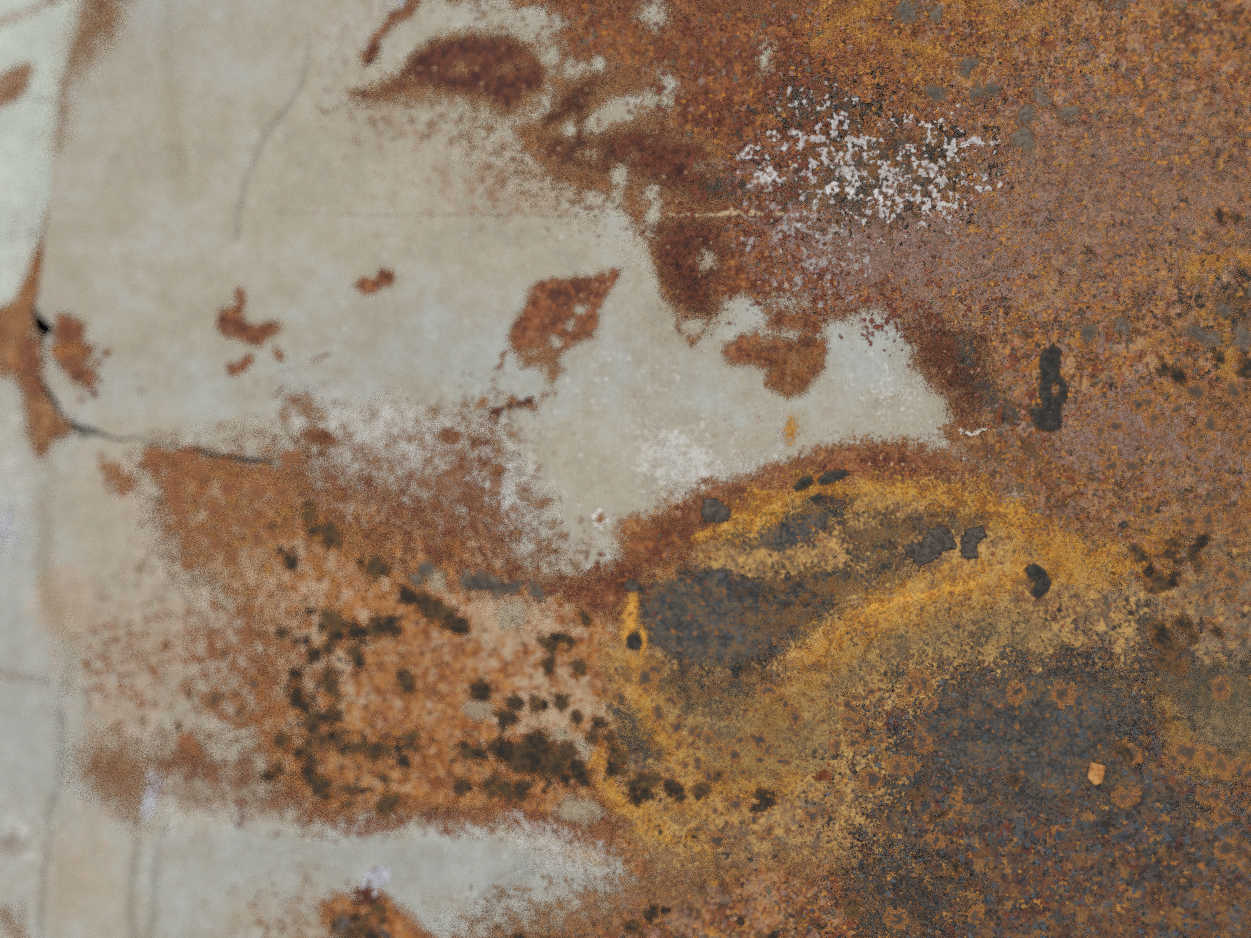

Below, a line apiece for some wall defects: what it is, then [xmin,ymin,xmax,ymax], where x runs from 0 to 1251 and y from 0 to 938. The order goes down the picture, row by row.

corrosion [0,60,34,107]
corrosion [353,268,395,296]
corrosion [0,203,111,459]
corrosion [215,286,285,377]
corrosion [492,267,622,389]
crack [78,425,281,463]
corrosion [784,415,799,445]
corrosion [202,851,458,938]